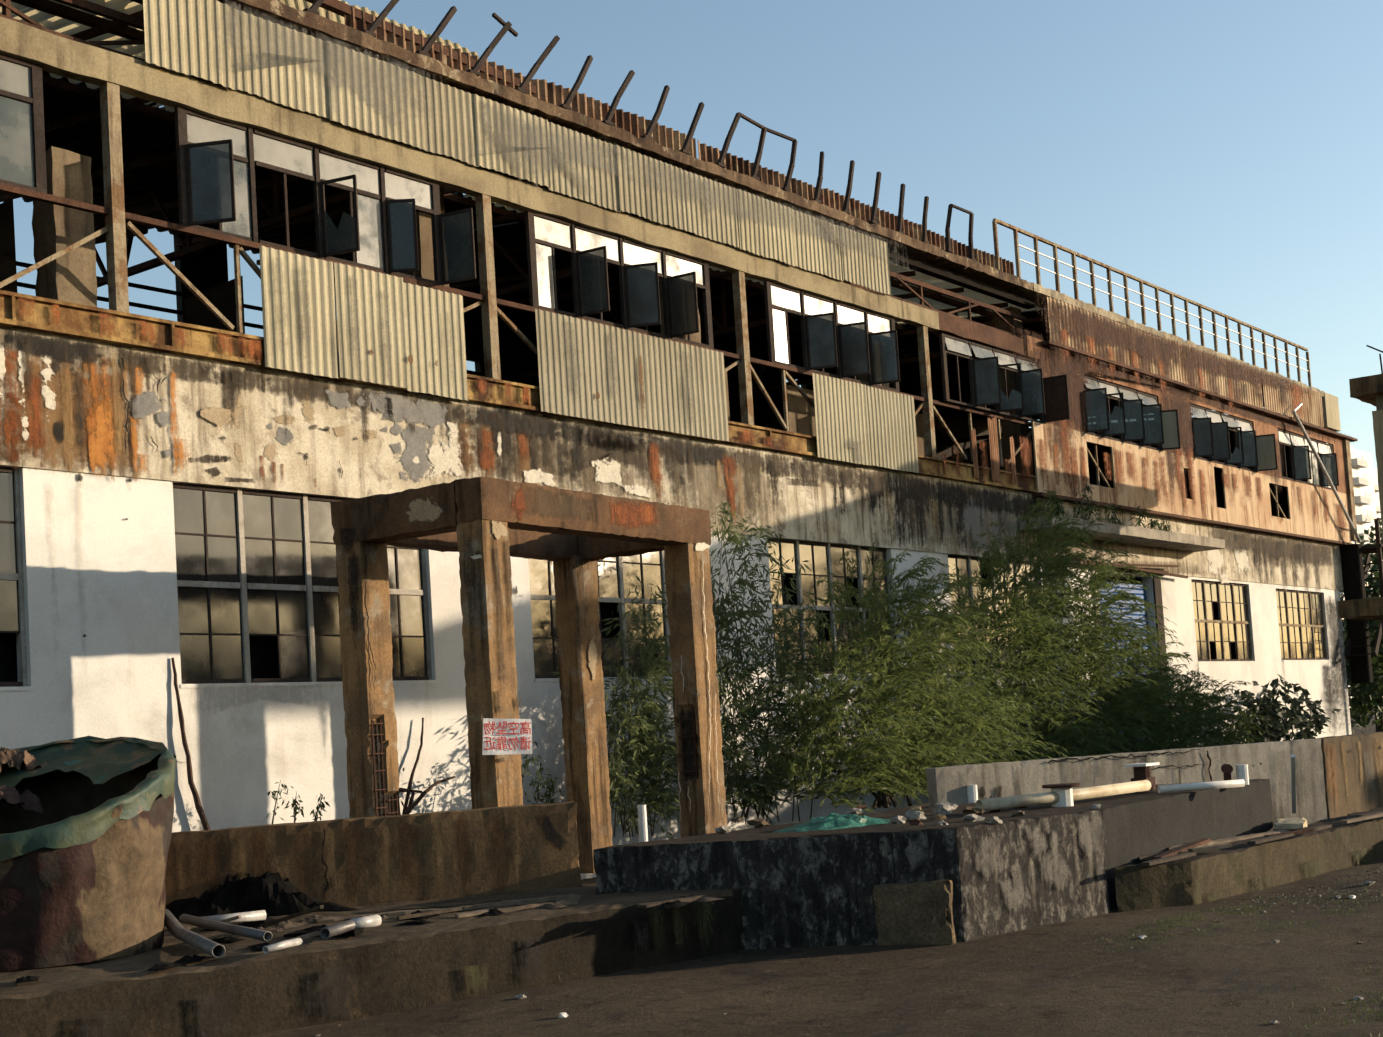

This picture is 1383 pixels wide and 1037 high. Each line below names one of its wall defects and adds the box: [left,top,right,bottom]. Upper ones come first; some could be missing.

peeling [0,345,56,440]
corrosion [0,350,147,478]
corrosion [170,373,189,469]
corrosion [217,332,262,361]
peeling [263,388,315,461]
leakage [276,263,311,347]
leakage [351,278,359,358]
spalling [362,422,463,522]
leakage [0,329,1082,553]
corrosion [610,443,661,528]
corrosion [1005,297,1324,514]
corrosion [1298,487,1346,537]